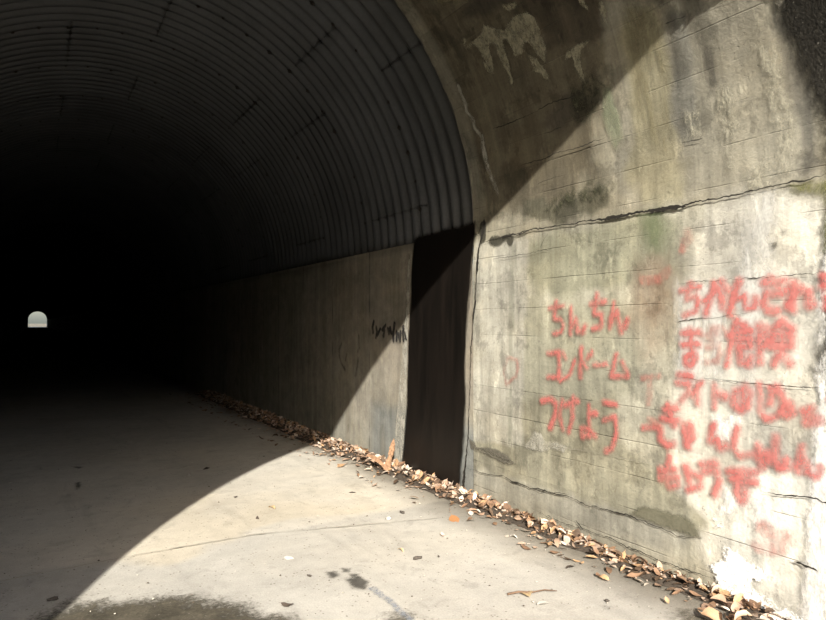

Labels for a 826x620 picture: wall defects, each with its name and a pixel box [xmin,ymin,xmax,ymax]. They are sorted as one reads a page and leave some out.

peeling [463,2,548,84]
peeling [566,40,589,79]
crack [463,175,826,581]
leakage [37,595,290,620]